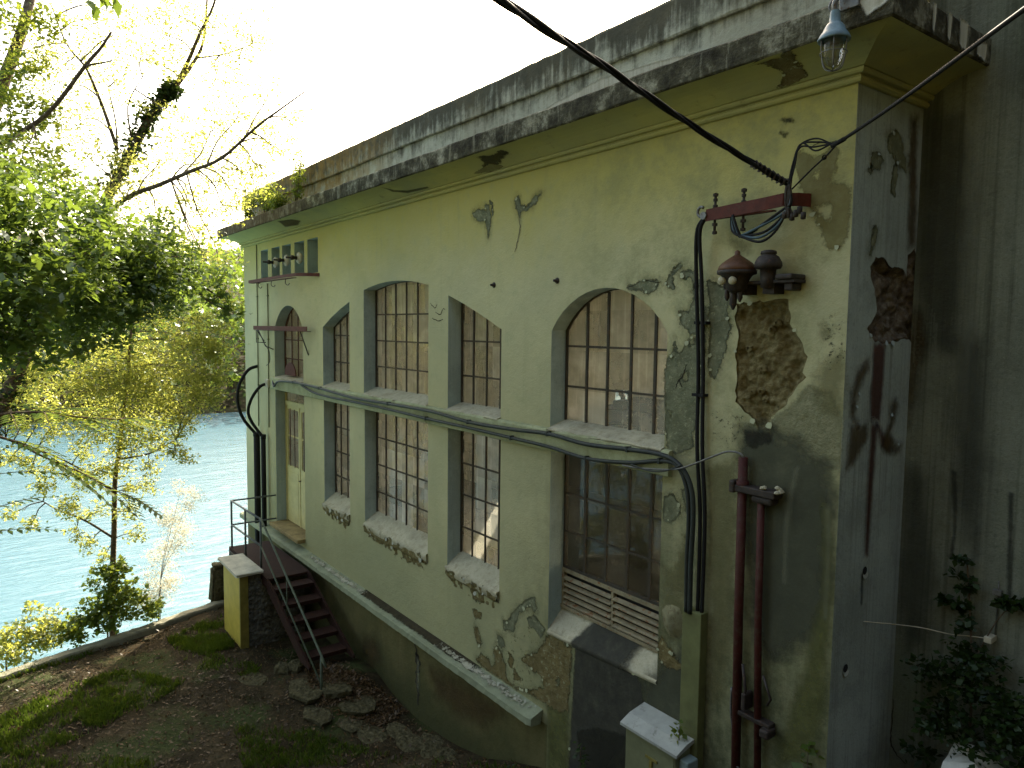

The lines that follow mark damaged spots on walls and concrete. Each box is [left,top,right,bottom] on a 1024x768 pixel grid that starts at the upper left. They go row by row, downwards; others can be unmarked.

damp [546,53,694,109]
peeling [757,51,808,88]
damp [474,150,509,174]
peeling [868,129,907,197]
peeling [472,200,494,238]
peeling [514,194,541,218]
flaking render [867,225,916,346]
flaking render [627,262,808,454]
damp [712,415,836,661]
peeling [437,591,574,714]